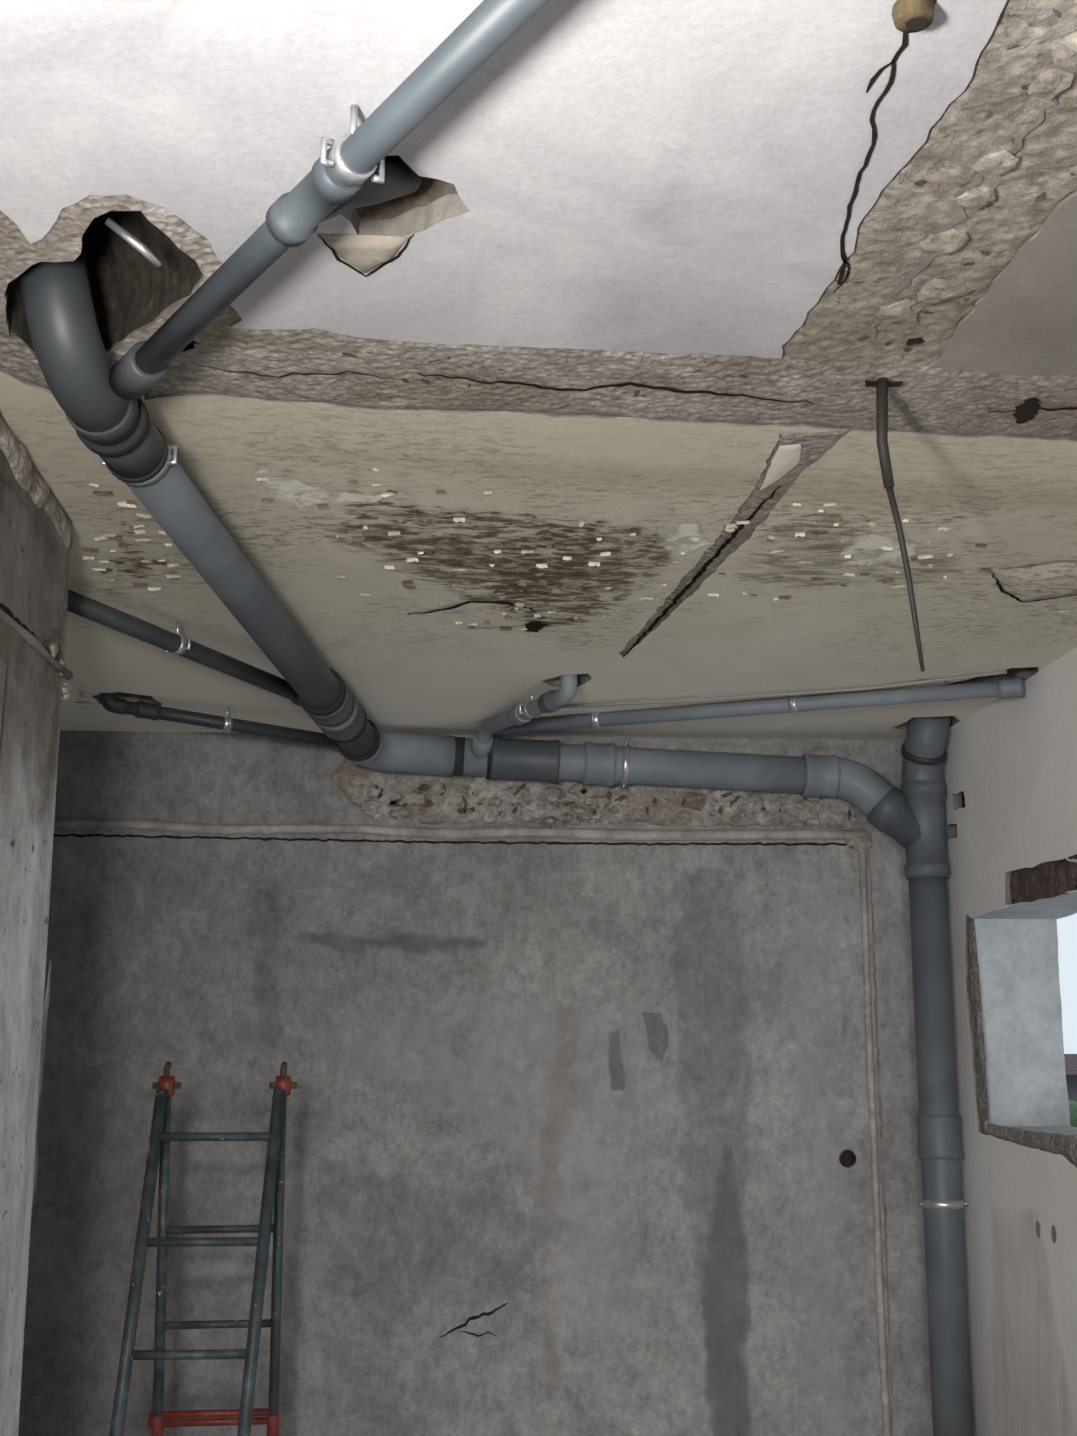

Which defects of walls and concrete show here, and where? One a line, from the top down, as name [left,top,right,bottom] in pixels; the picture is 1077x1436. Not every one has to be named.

spalling [0,194,223,390]
spalling [144,0,1077,657]
flaking render [0,413,182,591]
flaking render [330,759,870,830]
crack [440,1303,508,1337]